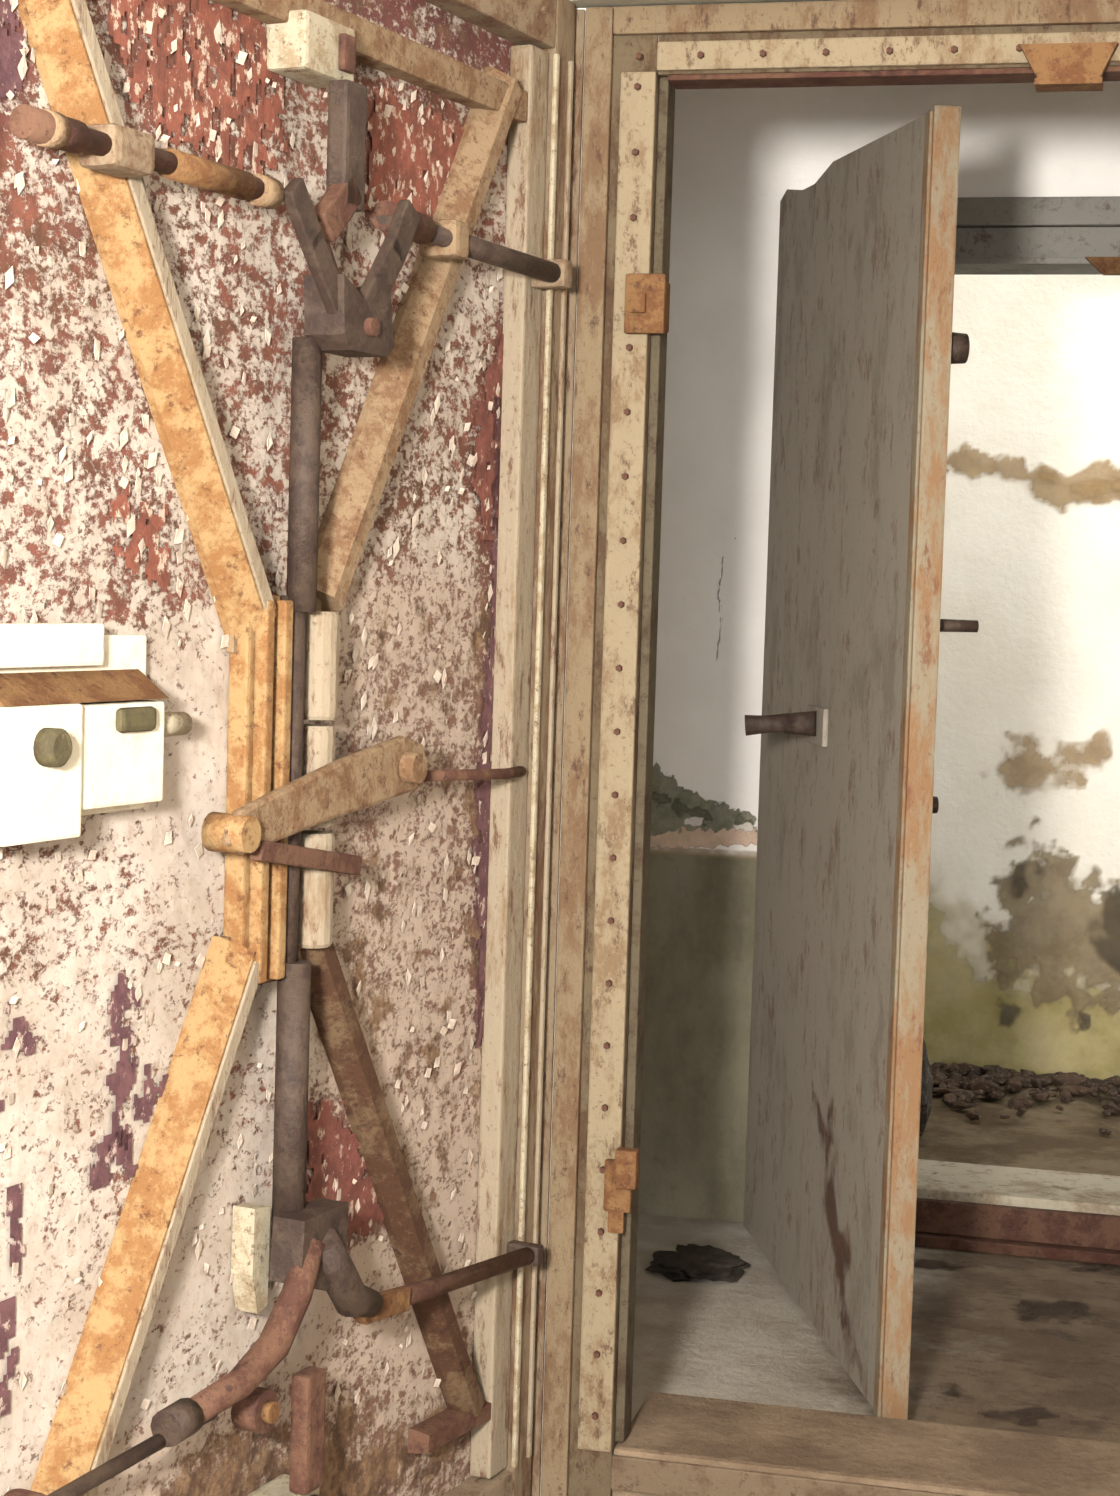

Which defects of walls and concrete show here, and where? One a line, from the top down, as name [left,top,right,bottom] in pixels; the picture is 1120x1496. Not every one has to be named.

peeling [0,0,36,100]
peeling [98,0,295,188]
peeling [14,171,25,195]
peeling [184,184,225,229]
peeling [364,83,465,219]
peeling [5,266,14,289]
peeling [194,302,246,386]
peeling [110,414,191,647]
peeling [356,466,428,575]
peeling [1,996,39,1058]
peeling [6,1183,25,1277]
peeling [0,1296,27,1417]